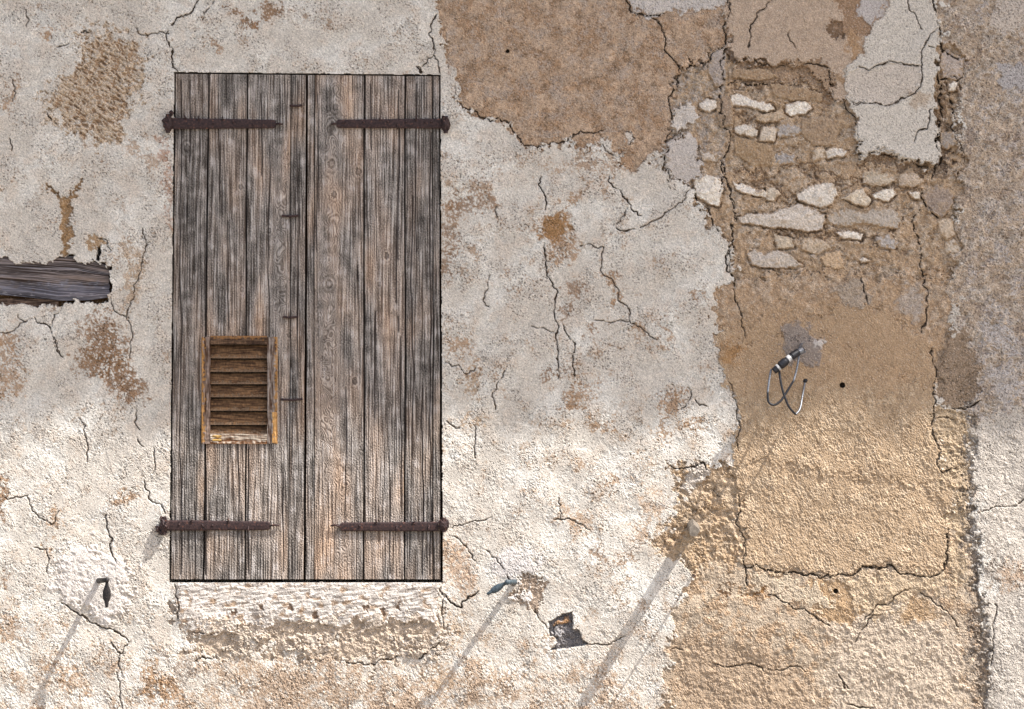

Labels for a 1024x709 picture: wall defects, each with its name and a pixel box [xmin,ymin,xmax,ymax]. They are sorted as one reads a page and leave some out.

spalling [40,22,149,147]
flaking render [436,0,968,285]
crack [459,0,979,474]
crack [62,603,129,709]
spalling [549,613,586,650]
crack [674,461,958,641]